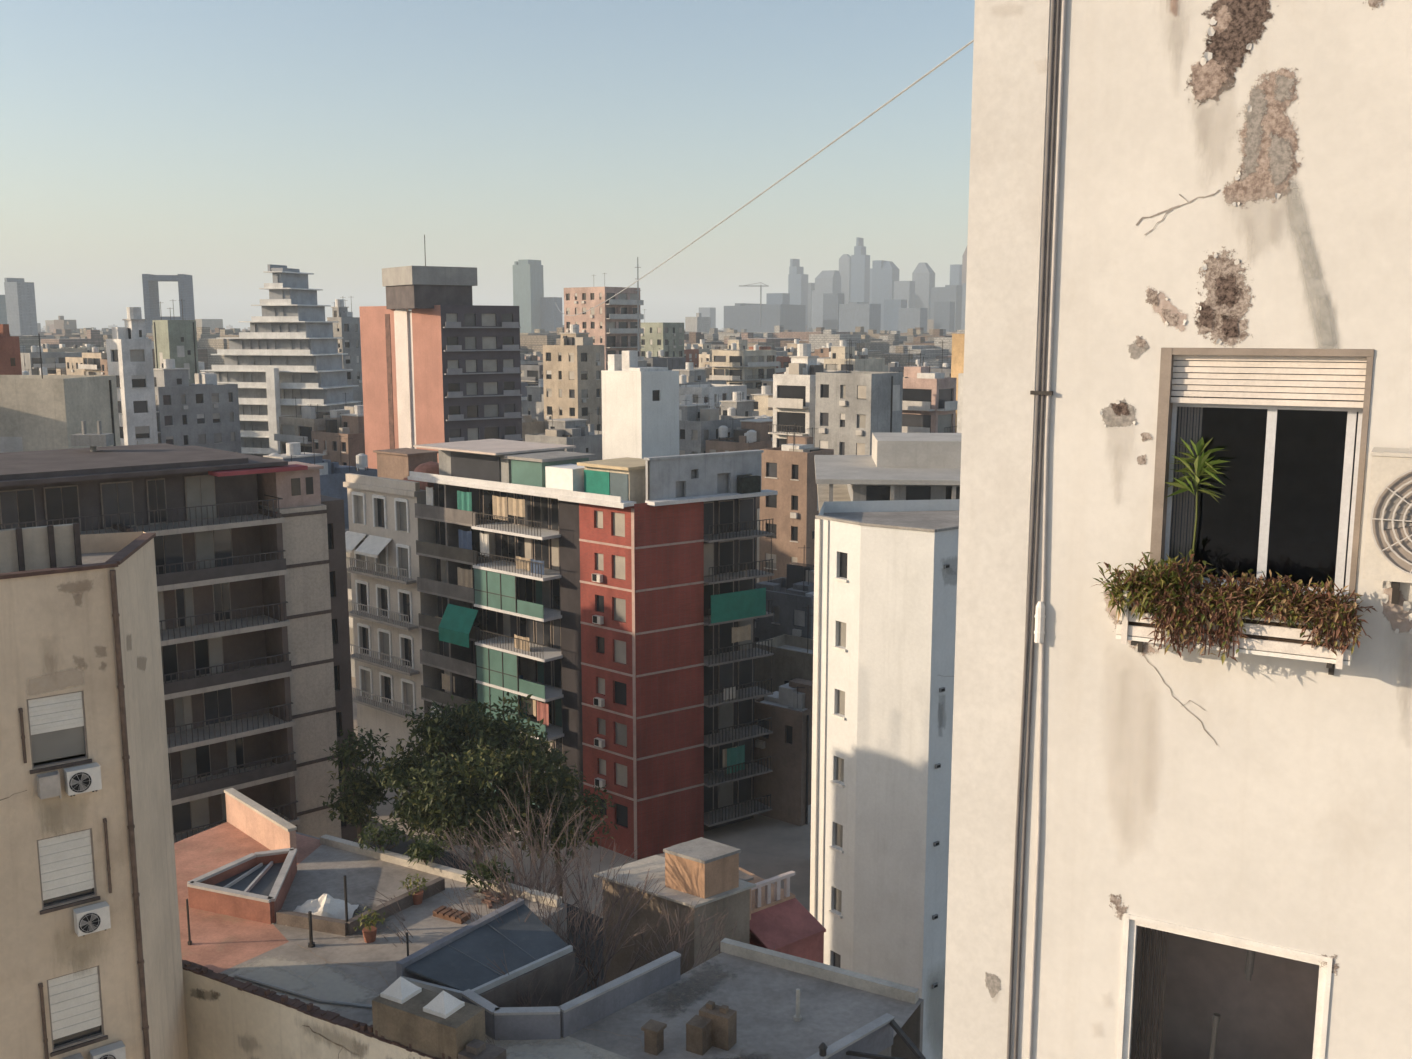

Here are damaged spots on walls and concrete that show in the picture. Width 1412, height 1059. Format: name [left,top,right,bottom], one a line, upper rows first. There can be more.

spalling [1186,0,1273,106]
spalling [1223,68,1301,207]
crack [1136,189,1220,235]
peeling [1145,247,1254,348]
water stain [1286,183,1336,349]
peeling [1128,335,1149,359]
spalling [1100,399,1152,465]
spalling [1109,894,1129,919]
spalling [985,972,1001,998]